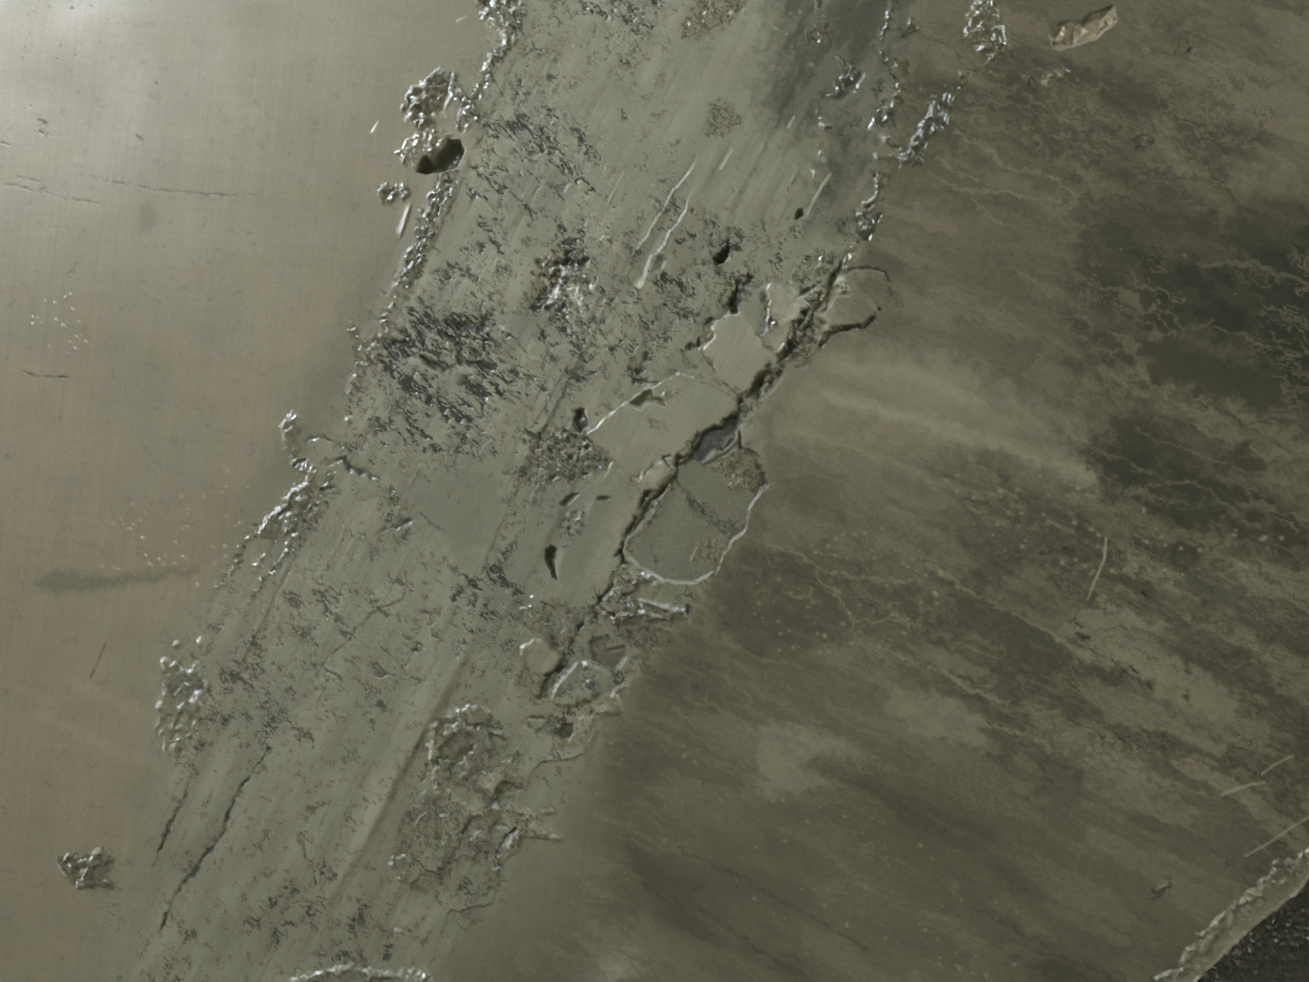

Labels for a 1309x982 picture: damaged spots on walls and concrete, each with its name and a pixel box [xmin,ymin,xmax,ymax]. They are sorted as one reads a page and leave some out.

spalling [1022,4,1117,90]
spalling [152,0,1014,982]
crack [536,265,903,705]
water stain [589,0,1309,982]
crack [151,744,273,937]